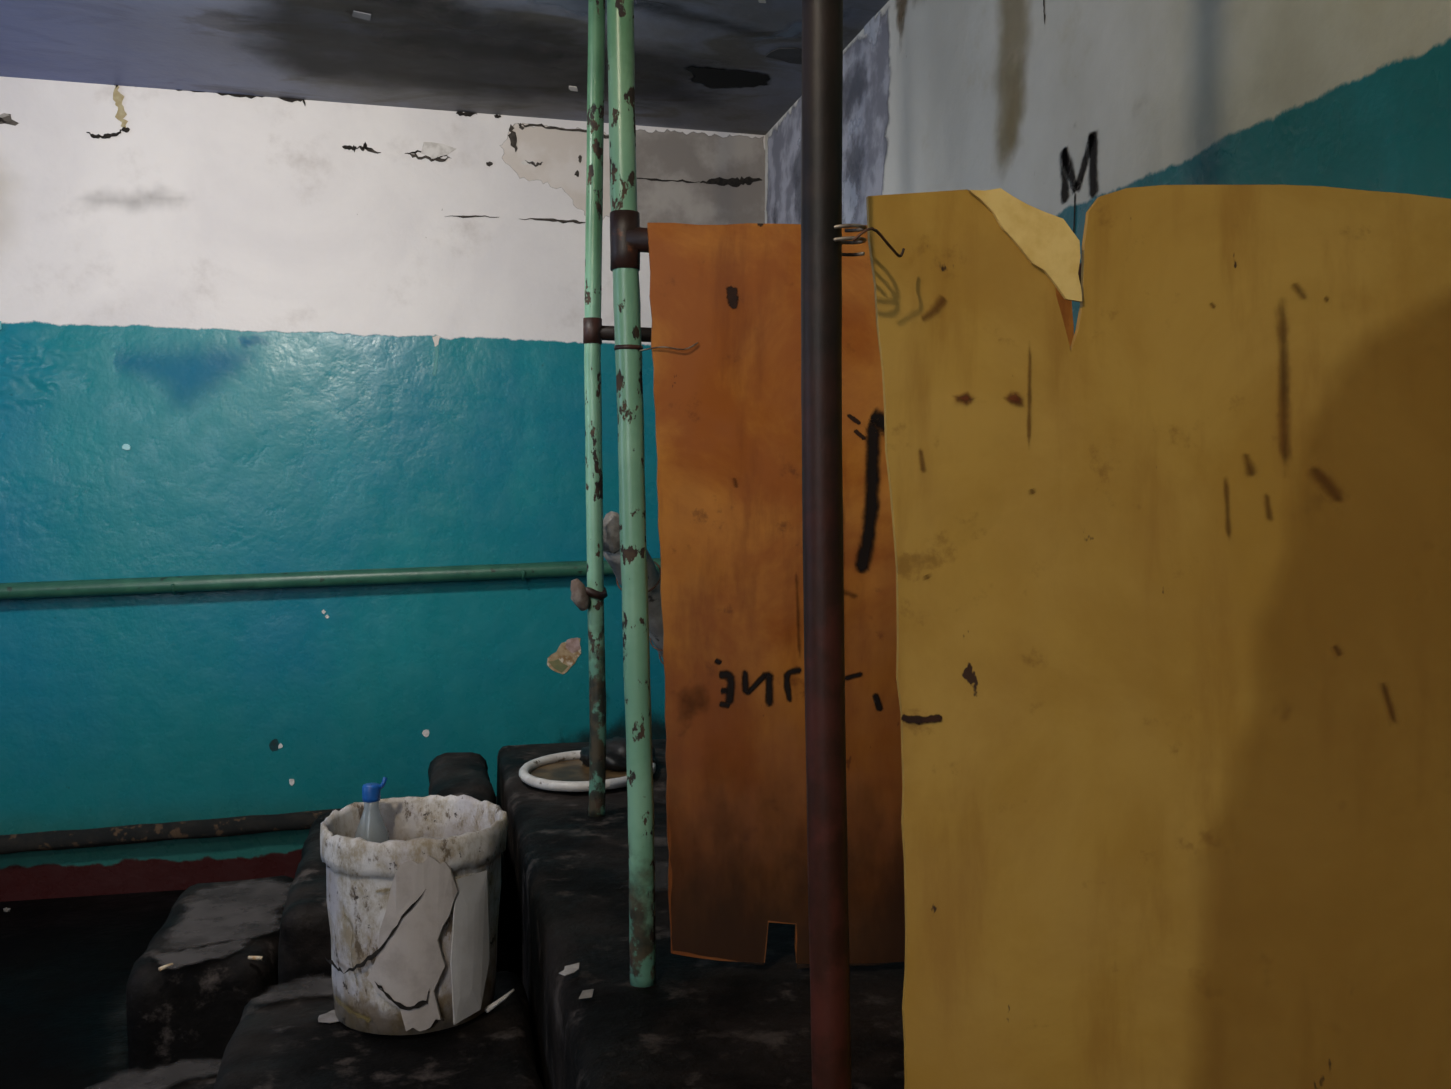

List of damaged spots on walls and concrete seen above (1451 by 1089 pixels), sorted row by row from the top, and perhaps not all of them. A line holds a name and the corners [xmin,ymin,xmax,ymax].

crack [86,84,130,139]
crack [177,90,306,105]
leakage [257,0,608,99]
crack [342,111,608,167]
peeling [486,123,611,219]
leakage [635,53,699,101]
spalling [636,129,765,228]
leakage [766,97,802,224]
leakage [842,0,907,225]
spalling [547,637,581,674]